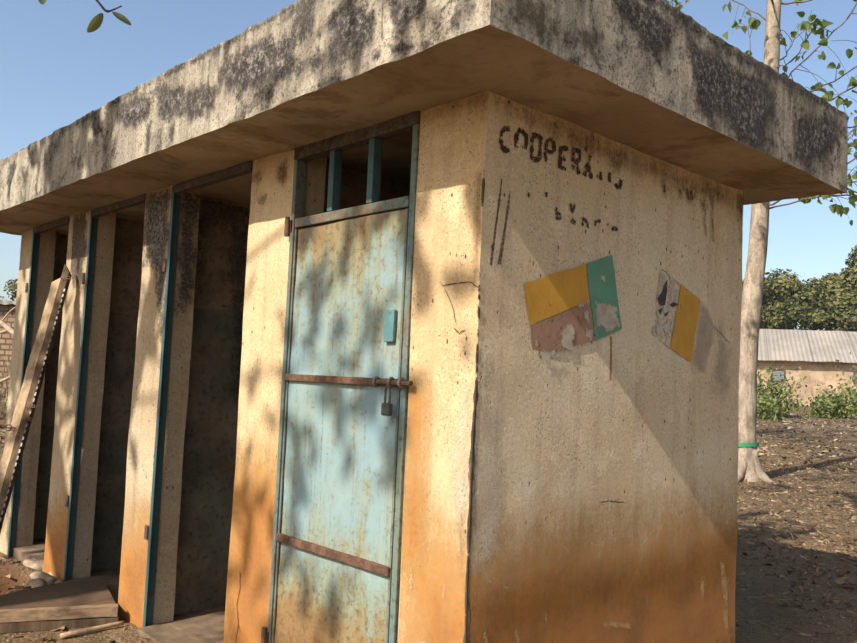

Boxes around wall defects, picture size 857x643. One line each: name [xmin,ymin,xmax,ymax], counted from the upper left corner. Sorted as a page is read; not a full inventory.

water stain [391,0,426,52]
water stain [504,0,566,48]
water stain [110,0,376,154]
water stain [613,0,848,164]
water stain [68,110,108,156]
water stain [278,162,287,183]
crack [479,173,487,206]
water stain [142,190,250,395]
peeling [538,300,620,369]
crack [441,281,480,643]